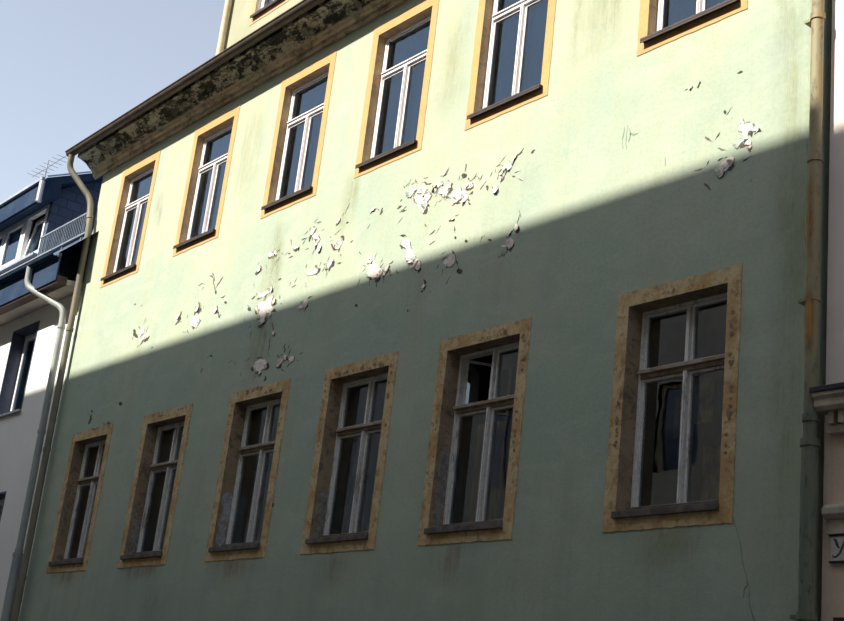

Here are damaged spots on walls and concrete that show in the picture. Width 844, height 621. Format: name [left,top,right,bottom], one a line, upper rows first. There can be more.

peeling [695,118,759,180]
peeling [397,148,535,223]
peeling [255,203,353,279]
peeling [357,252,398,287]
peeling [399,234,426,292]
peeling [437,250,462,285]
peeling [498,211,521,258]
peeling [175,273,227,332]
peeling [132,318,153,348]
peeling [229,278,303,395]